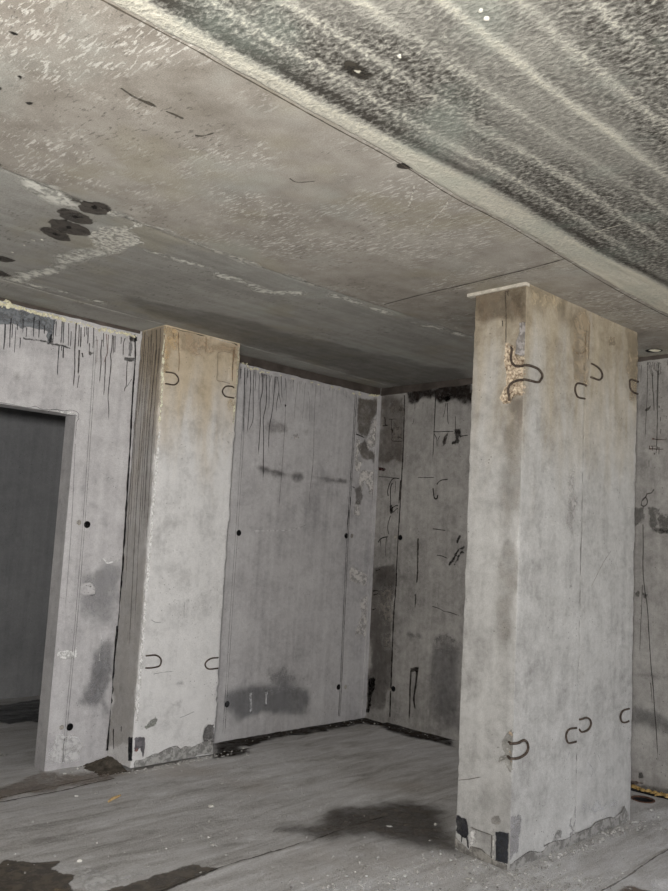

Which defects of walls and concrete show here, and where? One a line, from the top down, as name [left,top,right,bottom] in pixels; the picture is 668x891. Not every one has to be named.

water stain [0,176,145,288]
water stain [215,272,318,295]
water stain [0,306,161,416]
spalling [500,322,526,404]
water stain [240,362,380,473]
spalling [128,724,214,768]
water stain [213,677,452,758]
water stain [409,667,419,717]
spalling [454,806,629,871]
water stain [0,860,74,891]
water stain [107,865,216,891]